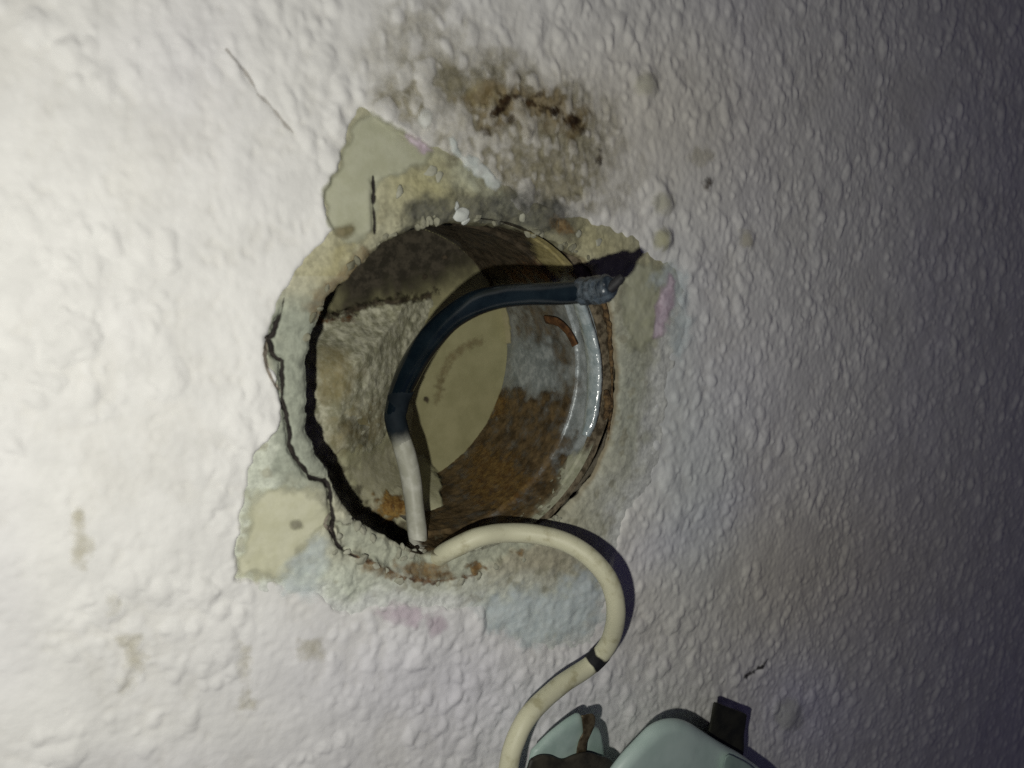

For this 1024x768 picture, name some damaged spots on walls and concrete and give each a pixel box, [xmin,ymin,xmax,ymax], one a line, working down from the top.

peeling [323,114,444,271]
damp [380,81,424,121]
flaking render [414,201,496,231]
peeling [450,138,500,189]
damp [433,59,604,210]
flaking render [519,213,544,238]
peeling [621,263,674,352]
crack [263,301,357,558]
rust [356,387,571,585]
peeling [238,488,329,581]
flaking render [332,514,404,585]